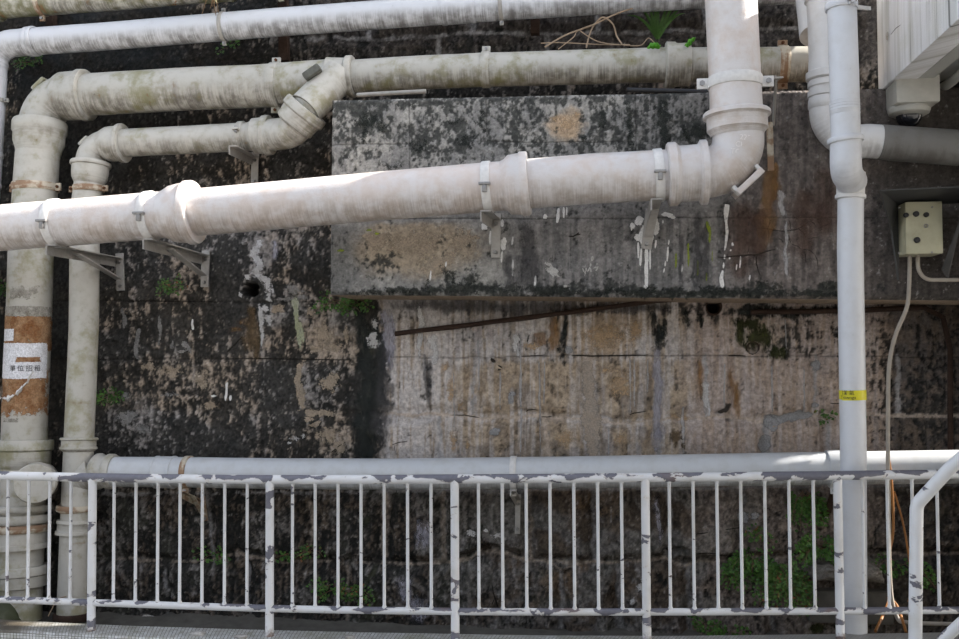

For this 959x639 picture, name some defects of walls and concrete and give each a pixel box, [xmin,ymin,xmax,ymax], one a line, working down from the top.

water stain [351,111,394,144]
water stain [454,106,486,149]
water stain [625,102,634,149]
water stain [653,97,708,147]
water stain [344,190,838,458]